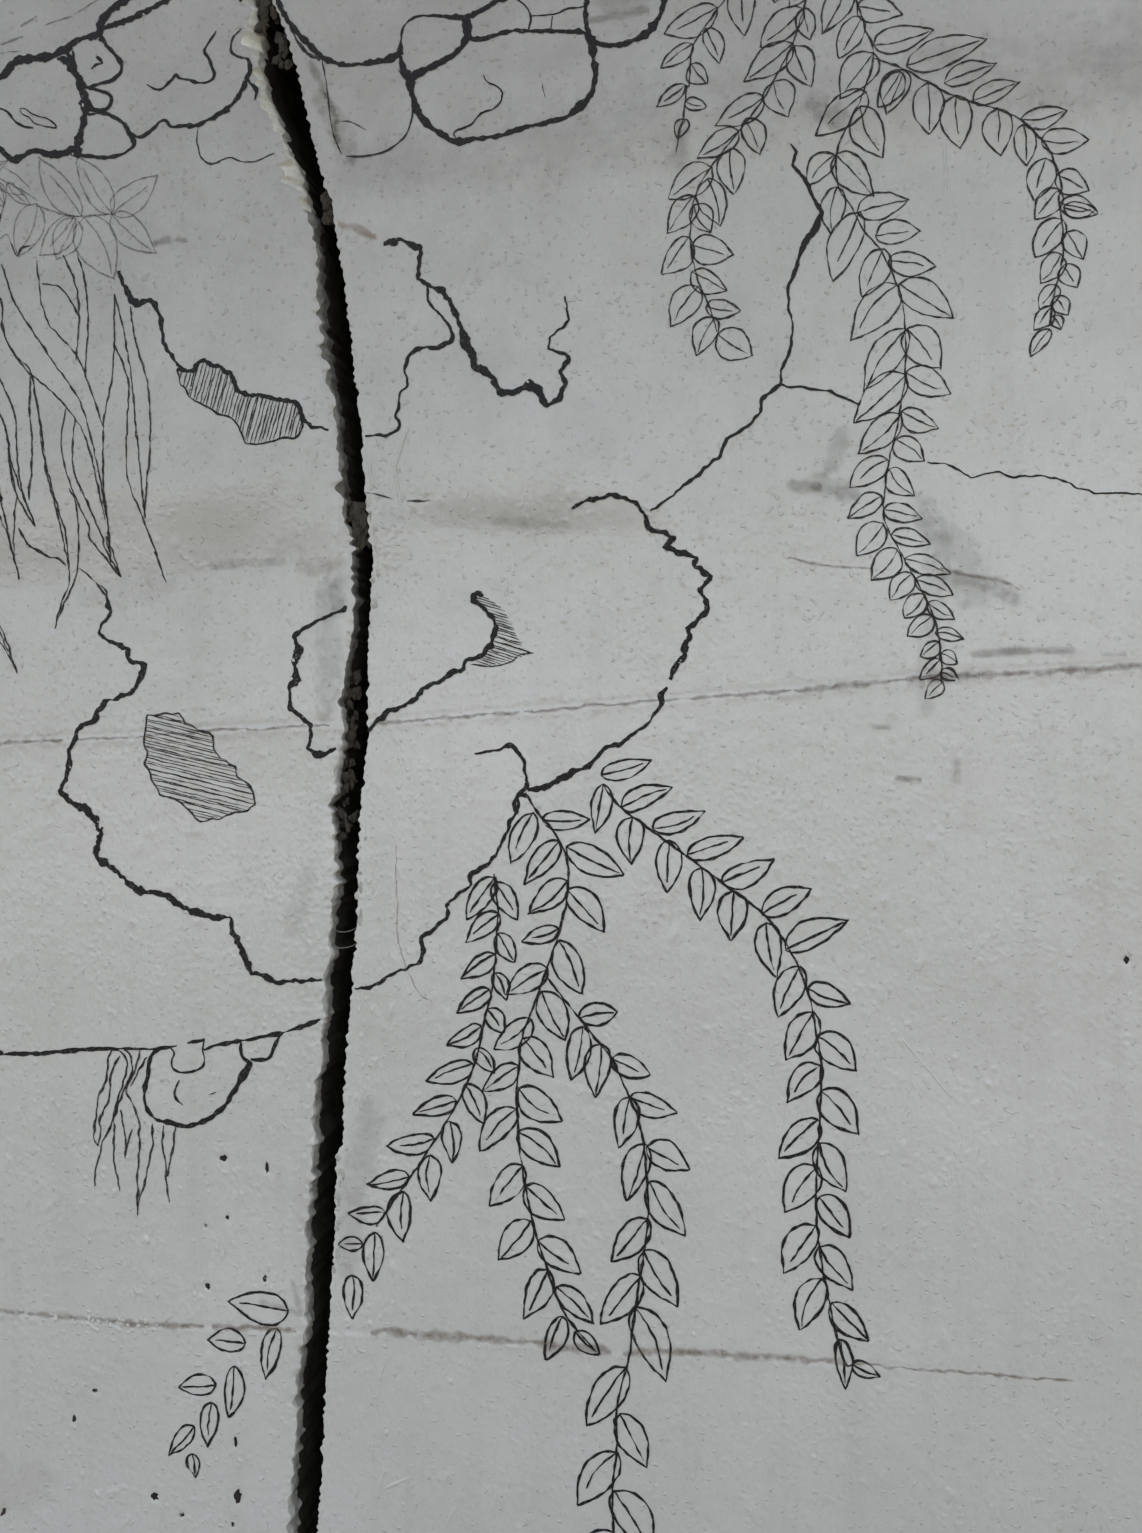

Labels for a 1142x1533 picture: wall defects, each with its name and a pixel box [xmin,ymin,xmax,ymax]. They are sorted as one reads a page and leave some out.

crack [927,461,1142,495]
crack [768,665,1134,700]
crack [6,0,859,1533]